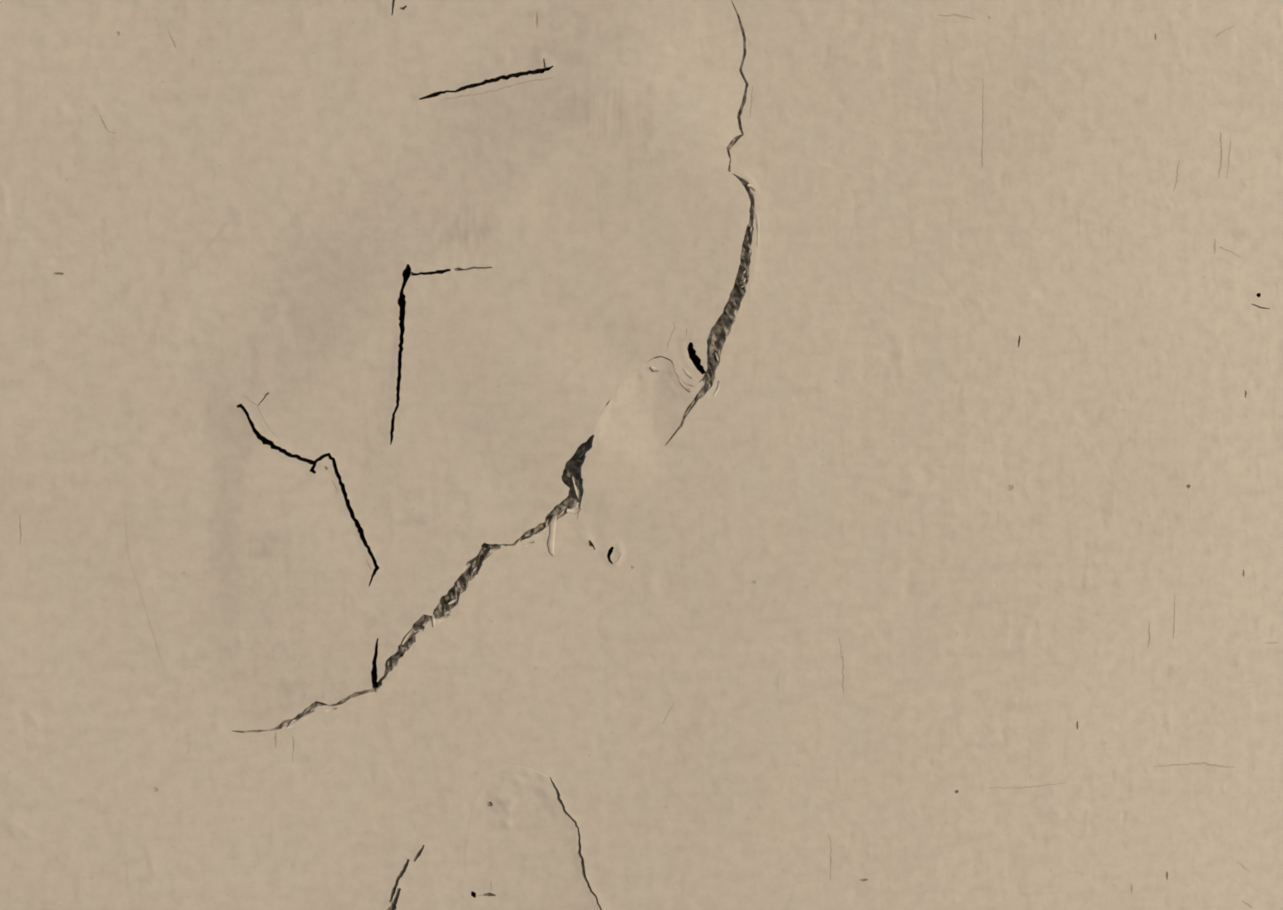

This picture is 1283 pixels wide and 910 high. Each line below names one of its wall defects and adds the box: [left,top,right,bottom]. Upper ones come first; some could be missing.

crack [419,12,554,101]
crack [390,264,492,445]
crack [237,392,379,587]
spalling [487,357,704,570]
crack [387,845,425,910]